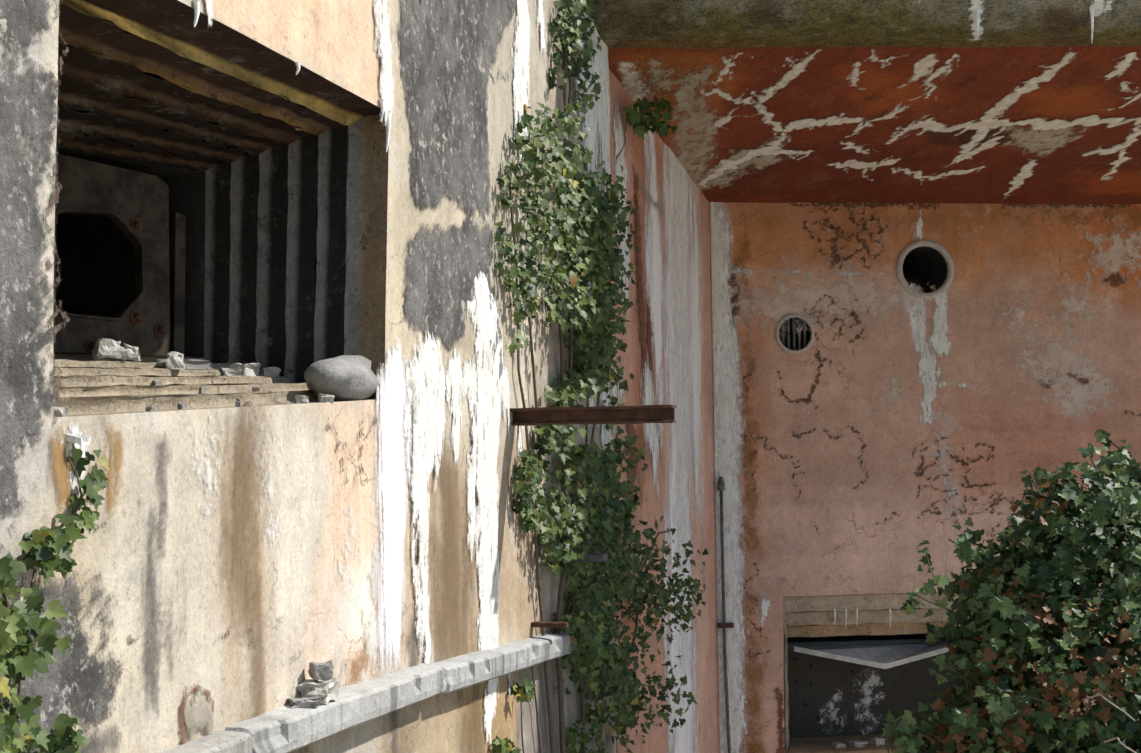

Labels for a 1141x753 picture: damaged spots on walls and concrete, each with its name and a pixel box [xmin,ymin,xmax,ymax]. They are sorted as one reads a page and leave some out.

water stain [968,0,985,42]
water stain [1089,0,1115,17]
crack [727,276,741,325]
water stain [572,13,966,753]
crack [737,206,888,498]
corrosion [107,430,124,511]
water stain [338,271,524,683]
crack [876,437,1026,543]
water stain [143,442,173,704]